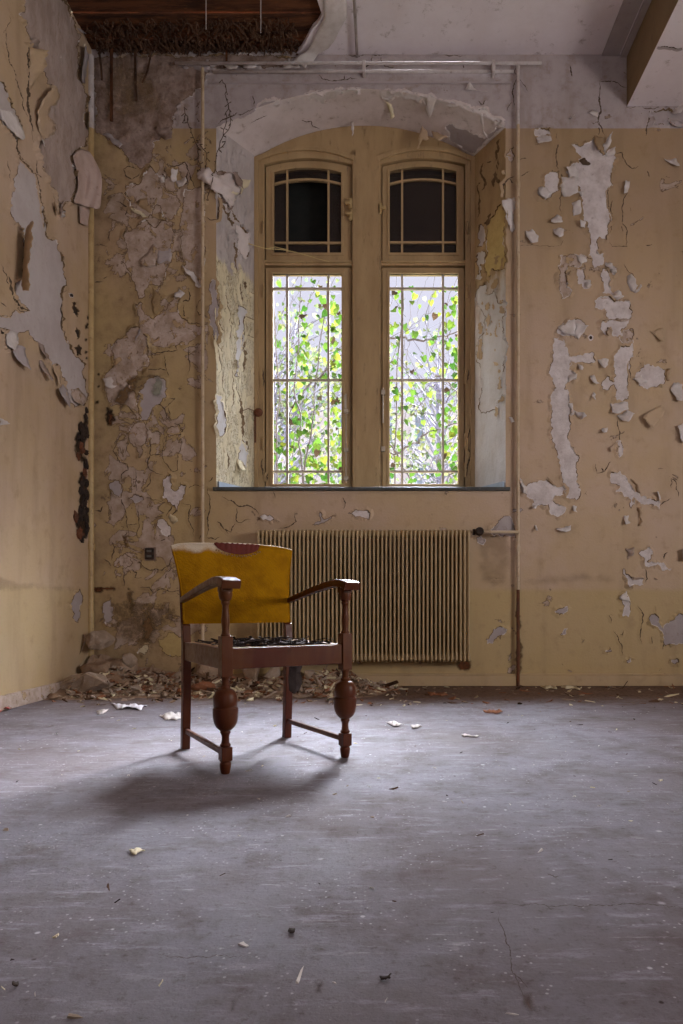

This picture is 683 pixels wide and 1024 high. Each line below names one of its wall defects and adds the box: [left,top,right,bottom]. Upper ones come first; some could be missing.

peeling [378,82,505,155]
crack [595,80,669,247]
spalling [0,0,347,423]
peeling [472,132,683,548]
peeling [213,393,228,439]
peeling [237,439,249,471]
peeling [154,471,190,541]
peeling [616,543,671,619]
peeling [134,630,181,661]
peeling [646,610,683,668]
crack [485,903,682,994]